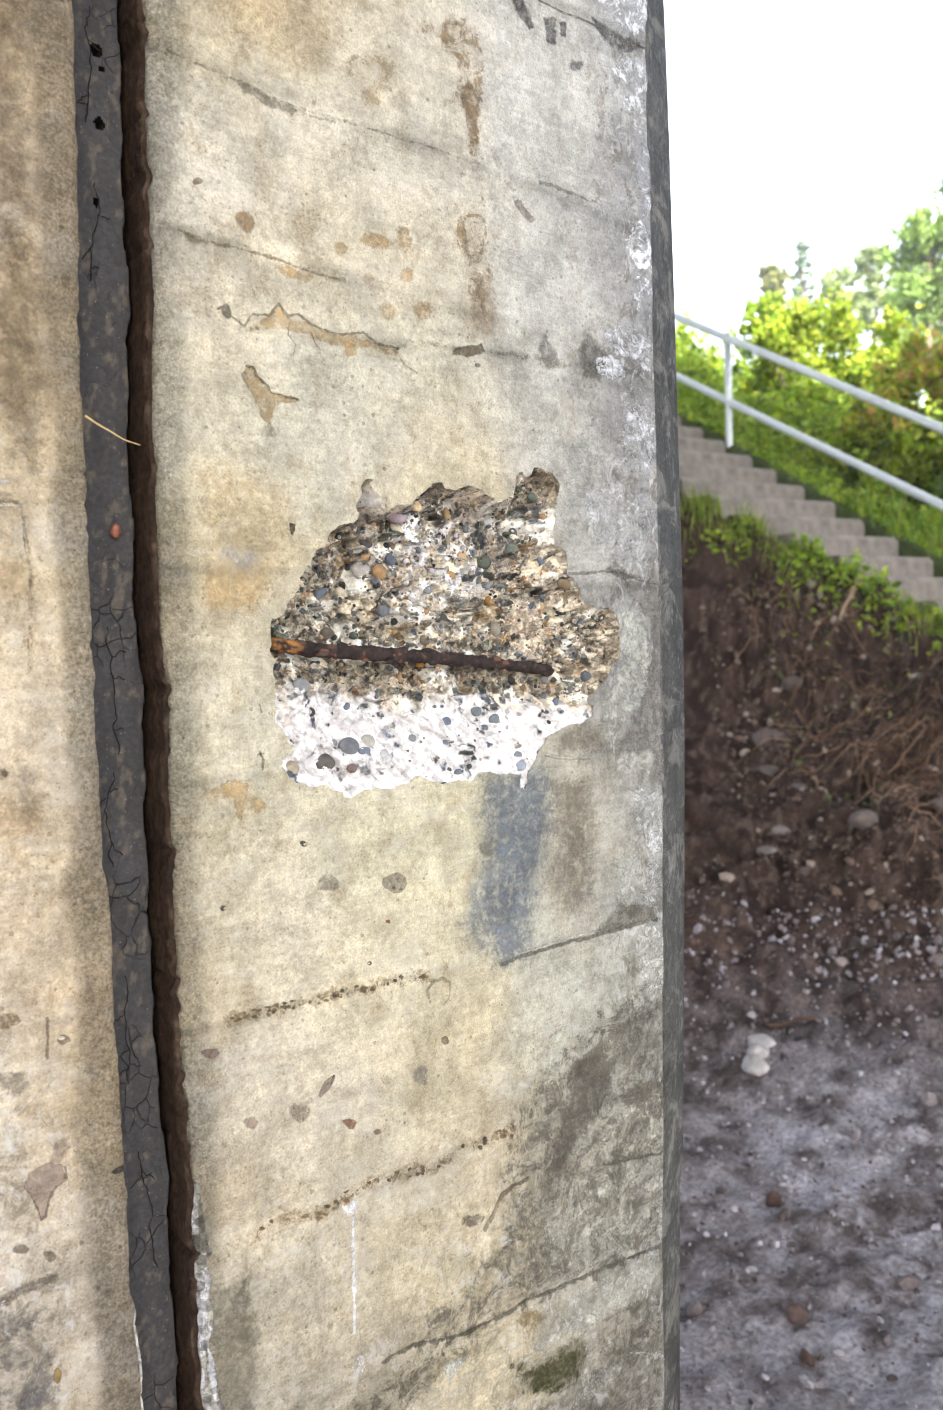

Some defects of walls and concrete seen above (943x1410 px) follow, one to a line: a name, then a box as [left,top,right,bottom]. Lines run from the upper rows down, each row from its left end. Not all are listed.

peeling [217,303,399,356]
peeling [453,343,503,367]
peeling [579,335,607,381]
rust [270,636,558,677]
spalling [270,467,620,798]
damp [559,584,664,906]
damp [382,873,407,893]
damp [464,774,594,960]
crack [464,1177,528,1231]
damp [354,925,666,1410]
damp [342,1199,357,1333]
crack [382,1244,661,1364]